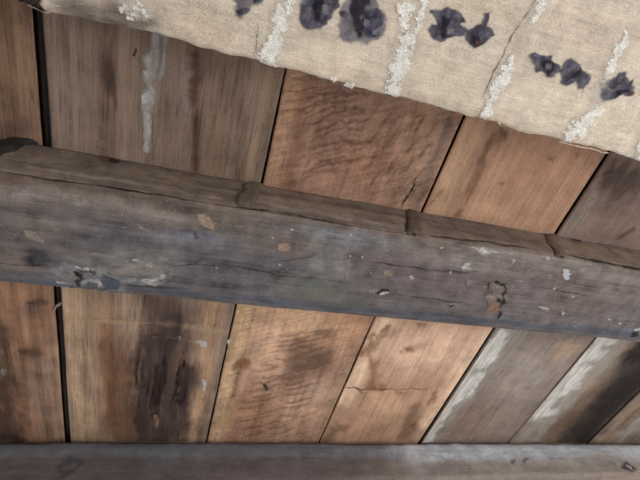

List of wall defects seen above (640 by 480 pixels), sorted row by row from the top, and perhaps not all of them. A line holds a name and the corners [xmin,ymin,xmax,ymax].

damp [235,0,263,17]
damp [299,0,386,44]
damp [429,7,495,48]
crack [485,0,536,92]
damp [530,52,591,89]
damp [600,72,635,101]
peeling [41,255,173,292]
damp [136,296,198,449]
crack [352,386,425,394]
damp [423,328,509,443]
damp [519,340,640,443]